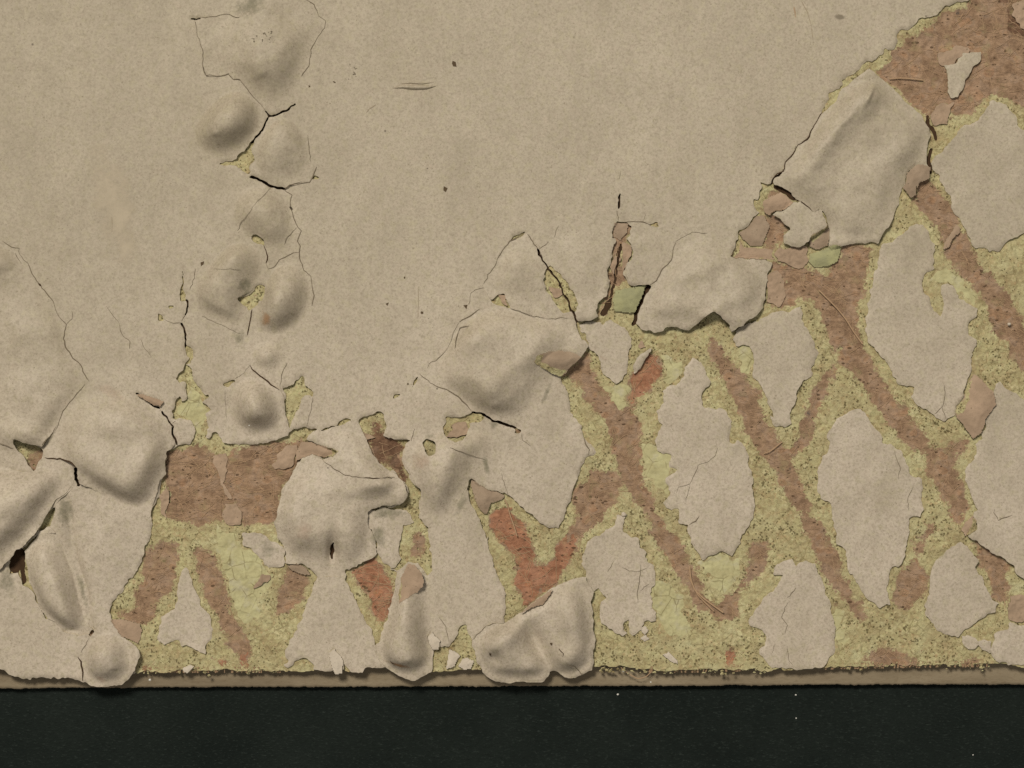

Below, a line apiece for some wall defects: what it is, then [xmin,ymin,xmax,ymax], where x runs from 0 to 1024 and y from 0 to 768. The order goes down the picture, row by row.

crack [191,14,296,143]
peeling [220,142,255,174]
crack [237,141,317,304]
crack [4,242,89,486]
crack [136,393,178,445]
peeling [158,271,186,321]
crack [166,268,252,348]
peeling [423,413,484,456]
crack [421,173,700,445]
peeling [467,0,1024,672]
peeling [110,346,432,674]
peeling [427,625,482,672]